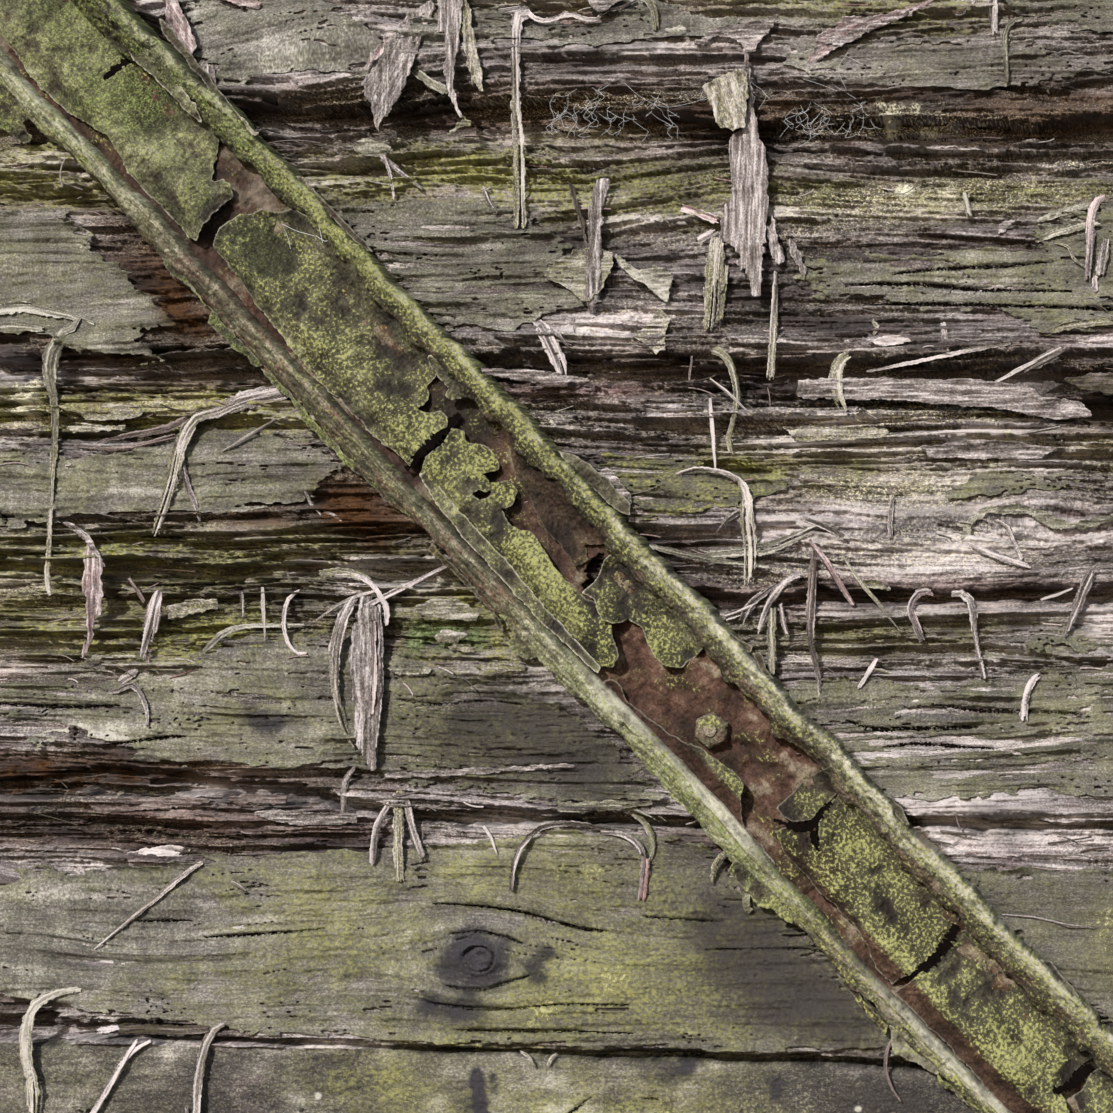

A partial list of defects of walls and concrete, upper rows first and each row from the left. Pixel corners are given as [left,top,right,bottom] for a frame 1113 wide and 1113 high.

peeling [164,0,1113,383]
peeling [0,203,902,1113]
peeling [597,346,1113,801]